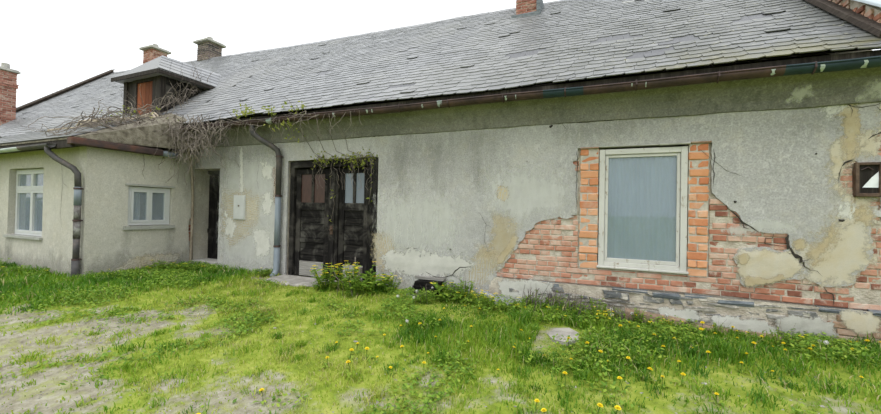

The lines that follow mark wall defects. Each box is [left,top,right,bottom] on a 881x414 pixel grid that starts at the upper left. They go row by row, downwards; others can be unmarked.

flaking render [496,83,881,310]